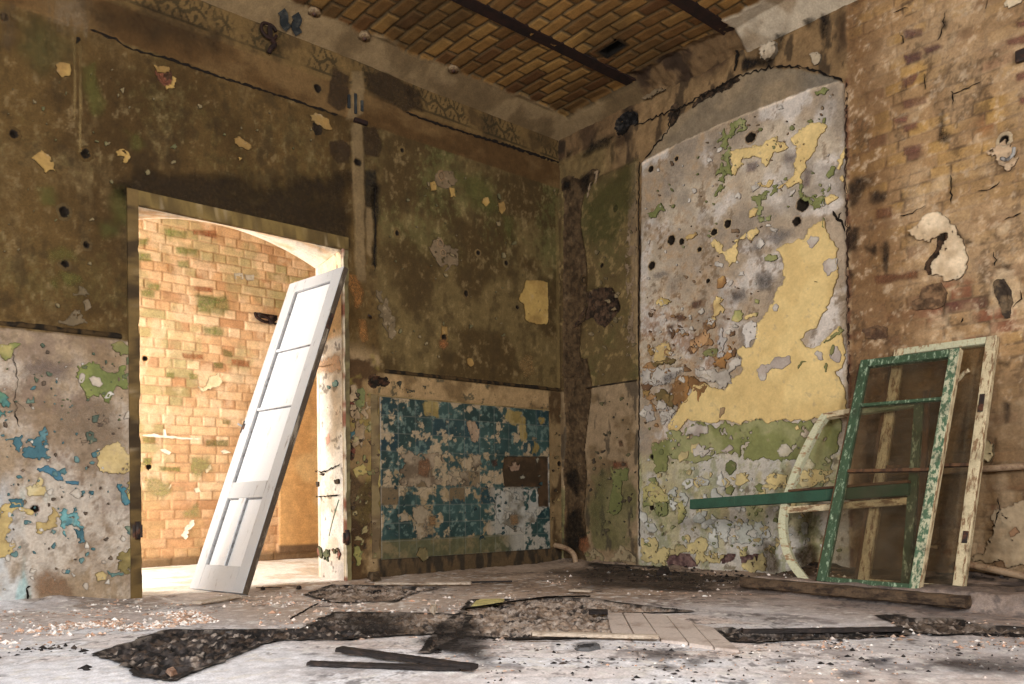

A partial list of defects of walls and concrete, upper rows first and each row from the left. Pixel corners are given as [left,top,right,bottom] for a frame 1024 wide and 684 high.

crack [76,29,338,116]
spalling [668,78,740,127]
water stain [564,173,591,191]
peeling [987,131,1019,172]
peeling [907,211,969,310]
peeling [429,87,847,573]
crack [595,50,850,546]
peeling [0,341,131,590]
water stain [566,470,578,496]
water stain [564,510,584,550]
peeling [971,500,1024,568]